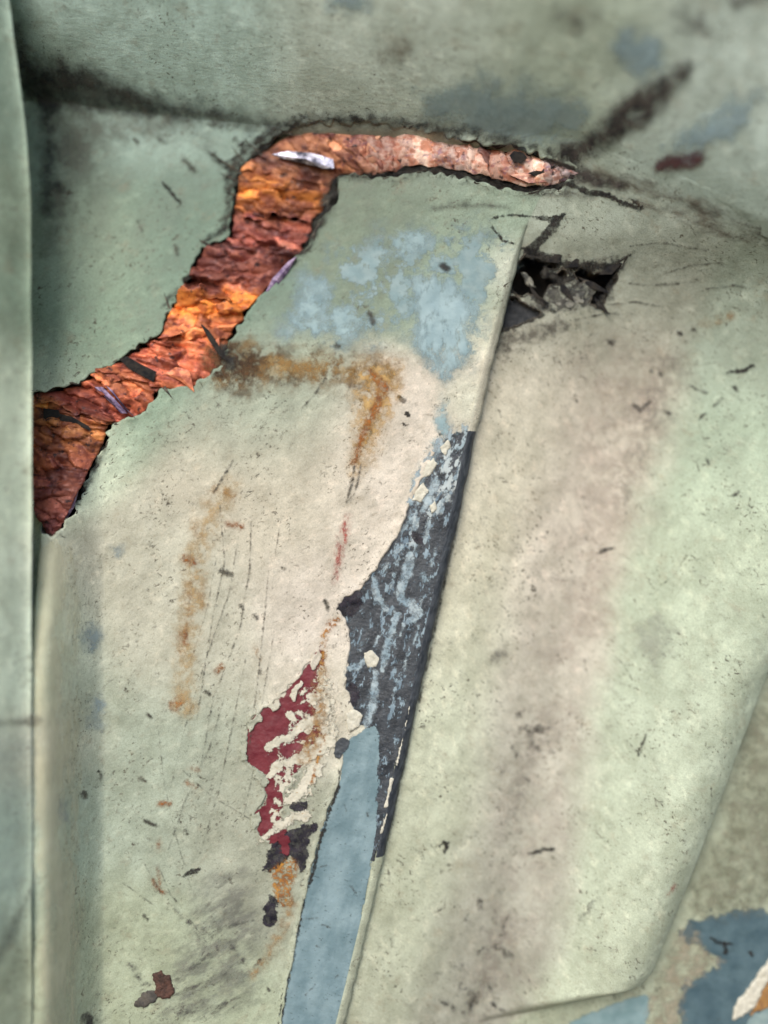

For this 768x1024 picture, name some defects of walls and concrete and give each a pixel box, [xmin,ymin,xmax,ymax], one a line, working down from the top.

crack [17,39,272,193]
crack [402,62,728,253]
peeling [502,252,627,332]
corrosion [206,341,398,502]
corrosion [170,554,202,713]
peeling [237,407,469,1024]
corrosion [129,963,175,1008]
peeling [569,907,768,1024]